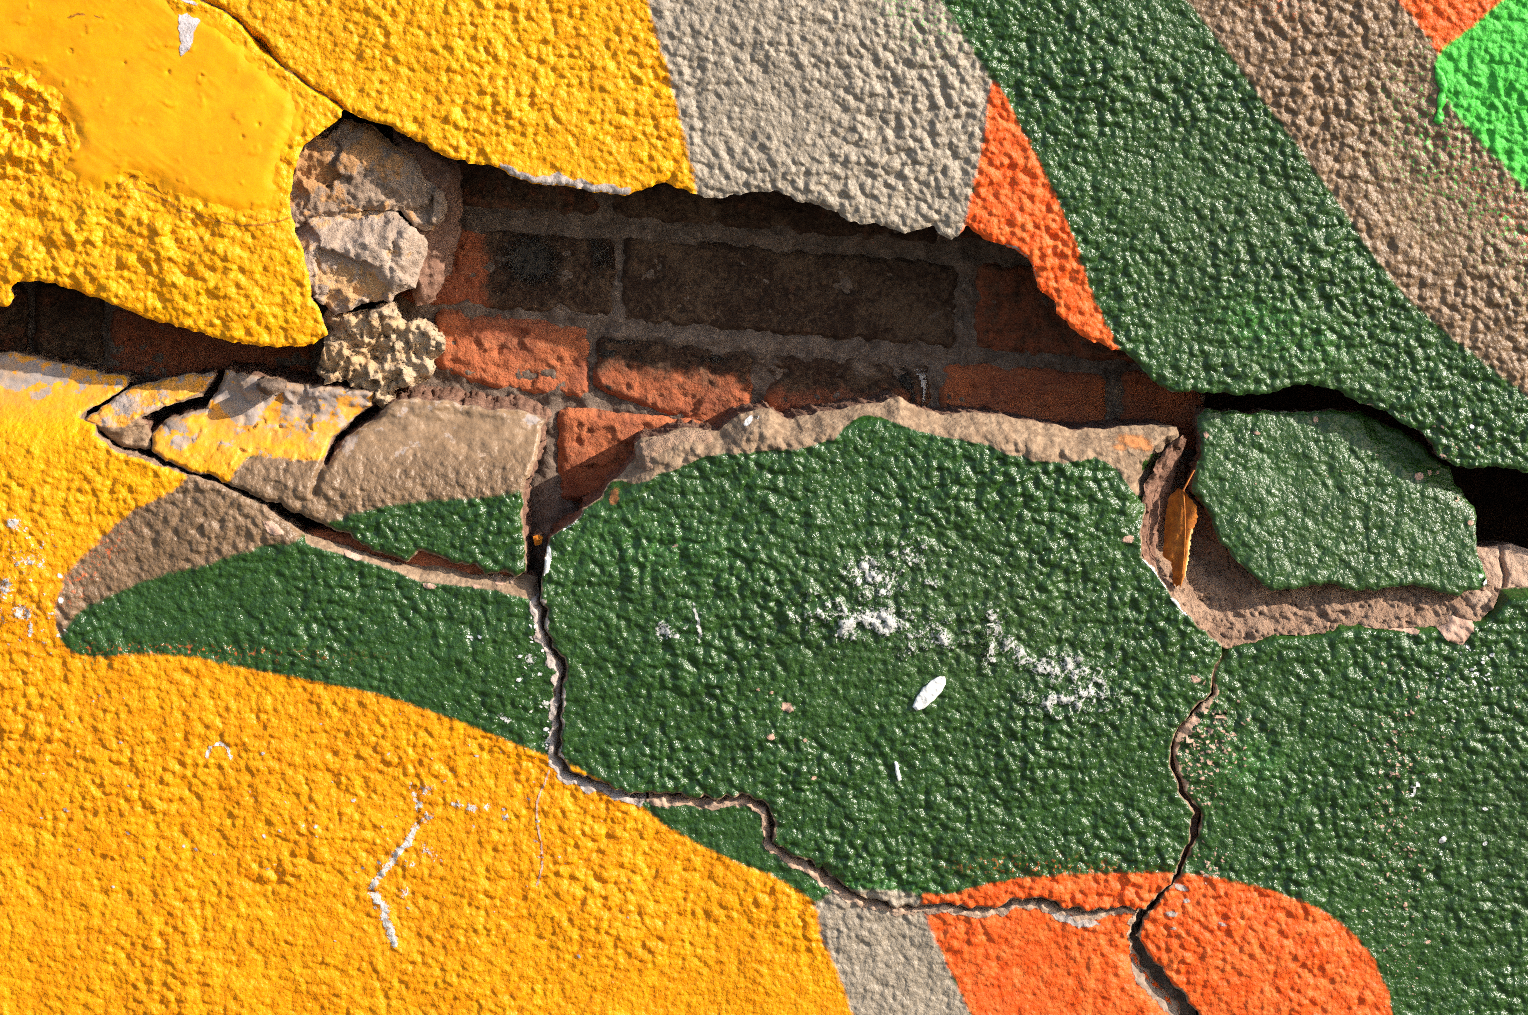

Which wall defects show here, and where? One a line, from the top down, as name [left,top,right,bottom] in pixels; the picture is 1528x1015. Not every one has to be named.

spalling [0,69,65,184]
peeling [500,163,631,195]
spalling [0,346,139,394]
leakage [683,603,702,643]
crack [530,593,1219,1015]